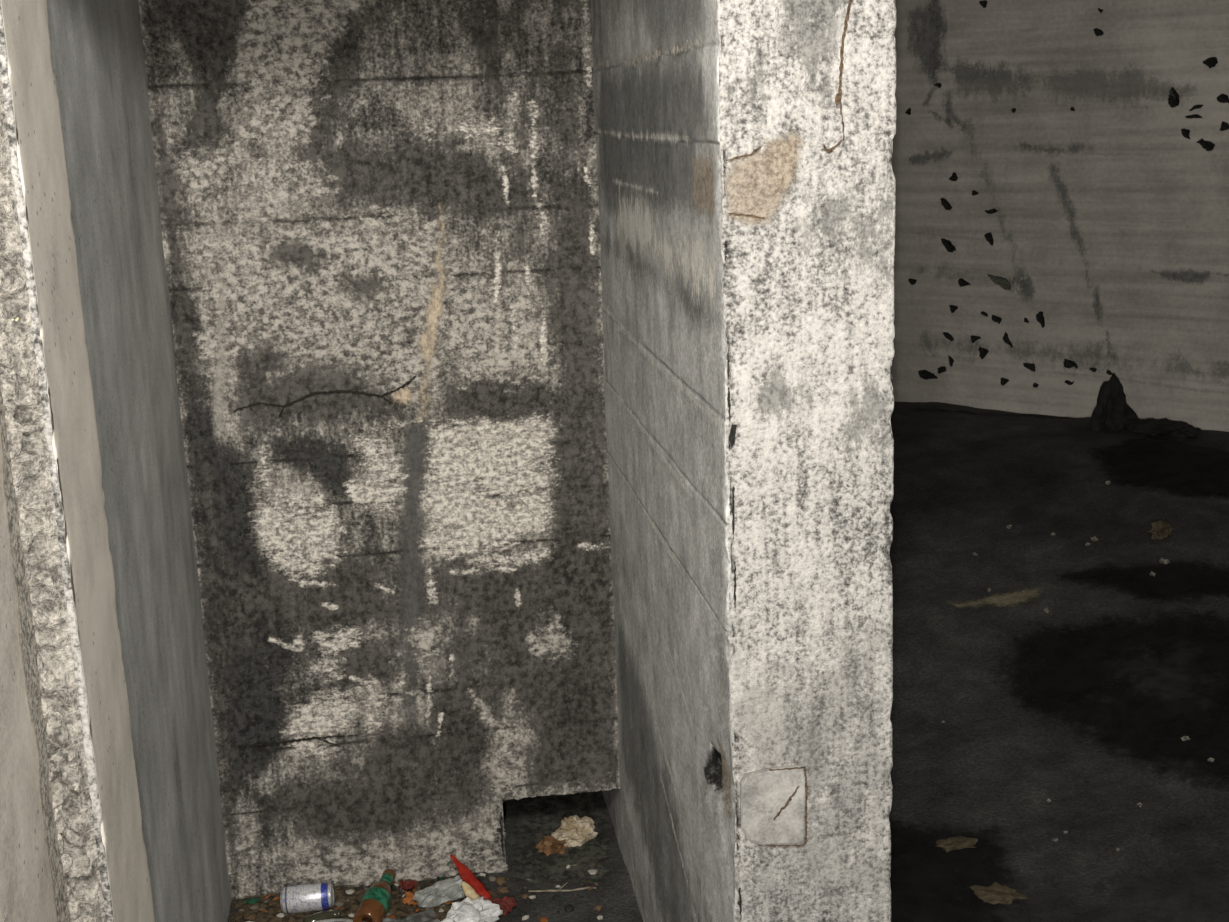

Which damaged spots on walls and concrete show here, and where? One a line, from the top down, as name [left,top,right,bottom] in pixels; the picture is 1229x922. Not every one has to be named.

crack [823,0,853,153]
leakage [1161,271,1209,282]
crack [234,376,416,418]
leakage [401,423,428,749]